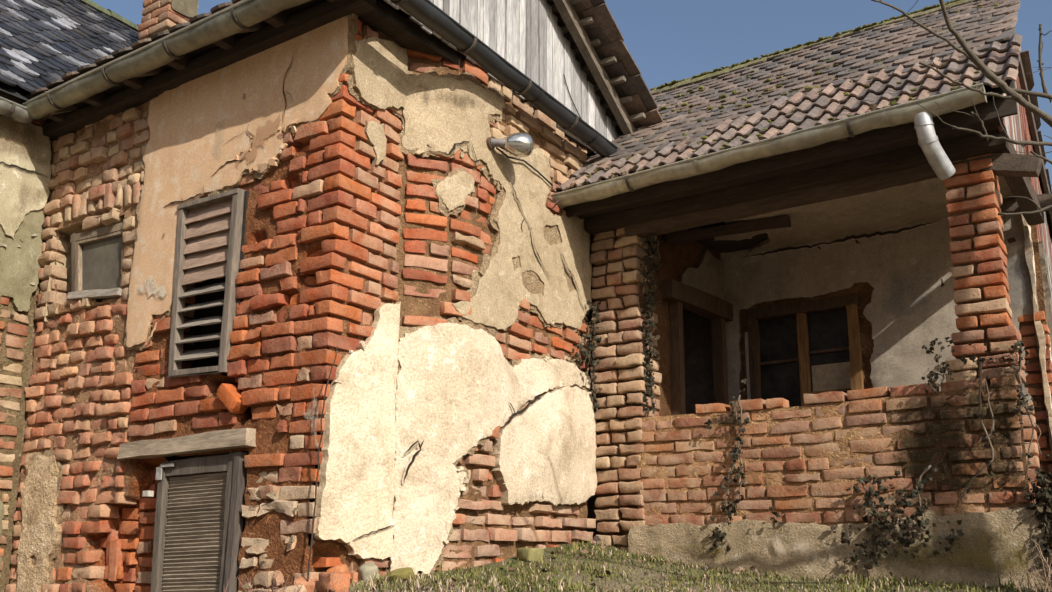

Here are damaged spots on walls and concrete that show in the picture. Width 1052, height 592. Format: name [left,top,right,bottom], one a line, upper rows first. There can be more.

crack [282,57,295,114]
peeling [355,19,587,217]
crack [743,220,941,259]
peeling [128,73,505,592]
peeling [485,298,591,380]
peeling [0,282,35,579]
crack [503,395,544,427]
peeling [435,405,596,571]
efflorescence [774,537,817,557]